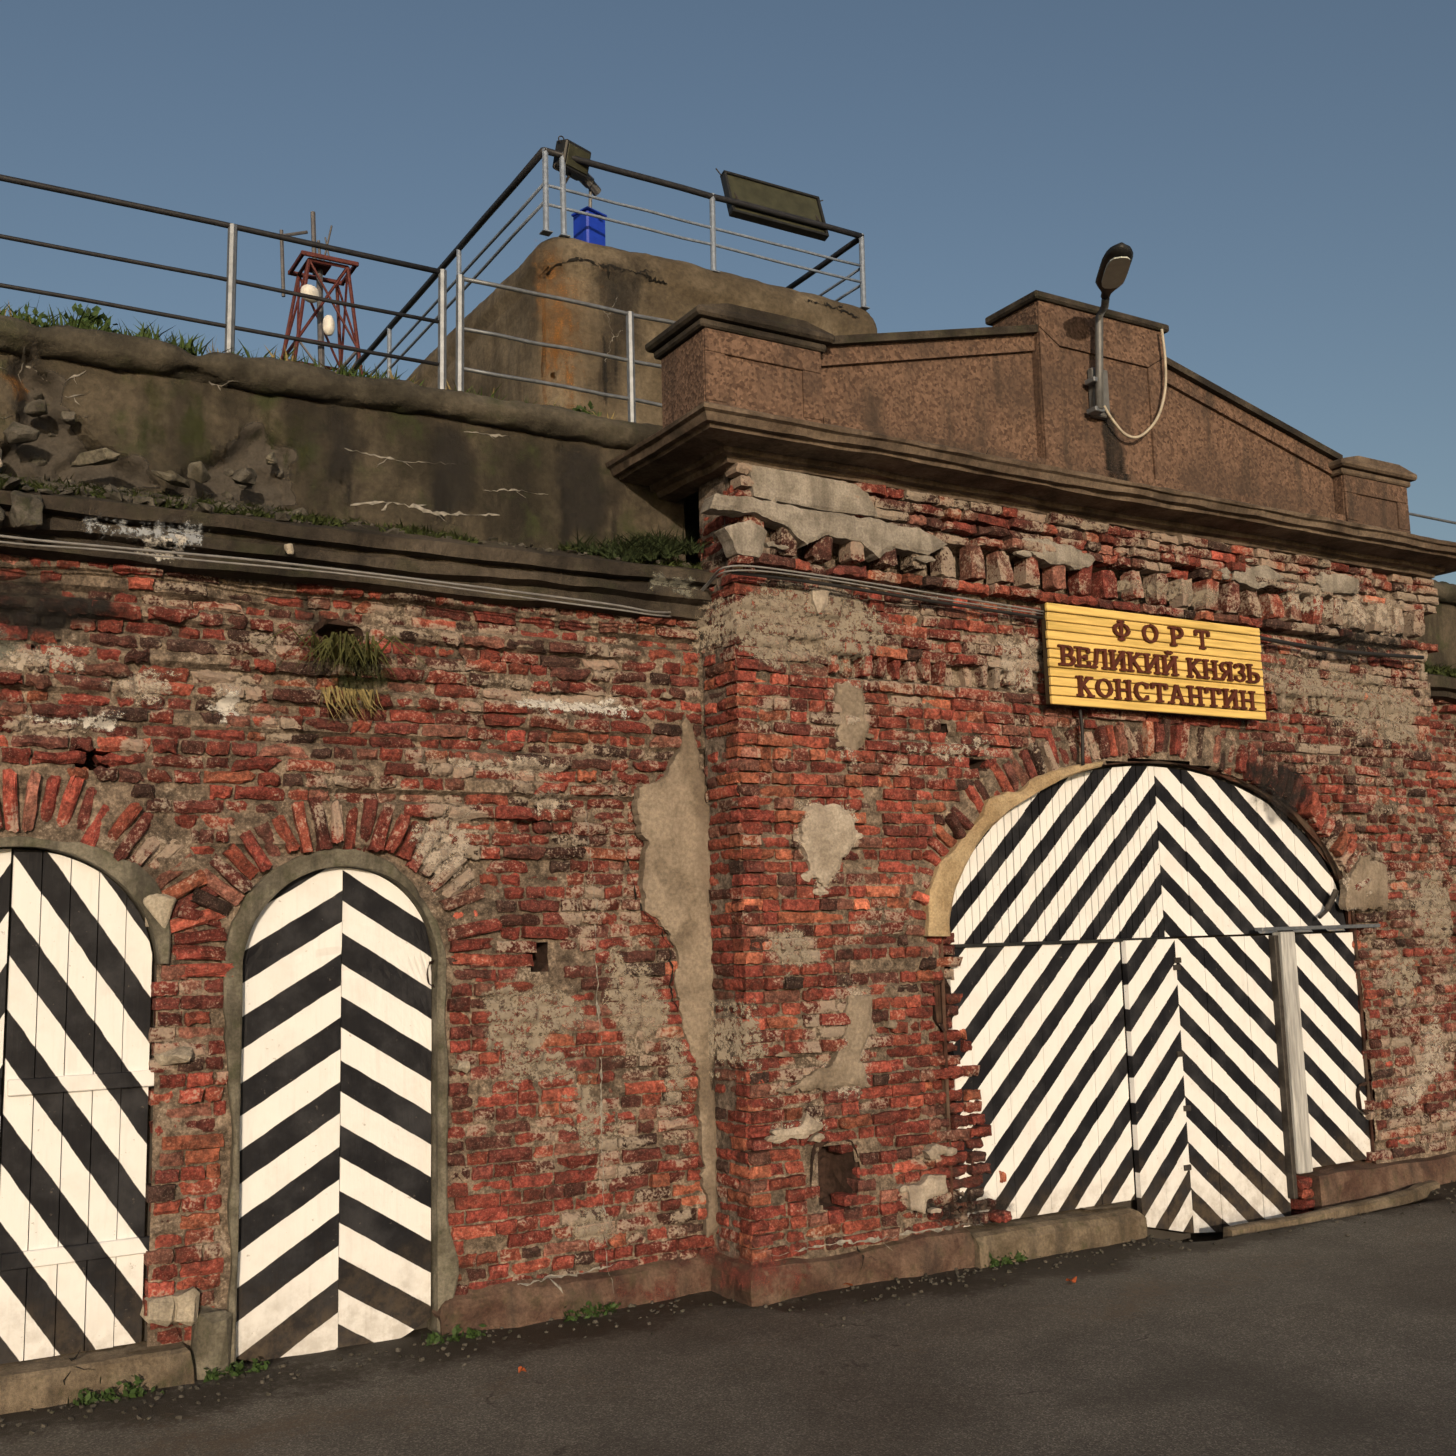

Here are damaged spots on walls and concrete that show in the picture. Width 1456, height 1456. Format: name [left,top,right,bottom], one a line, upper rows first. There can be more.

spalling [0,338,298,509]
peeling [700,465,948,564]
peeling [1013,538,1095,571]
hole [526,942,549,972]